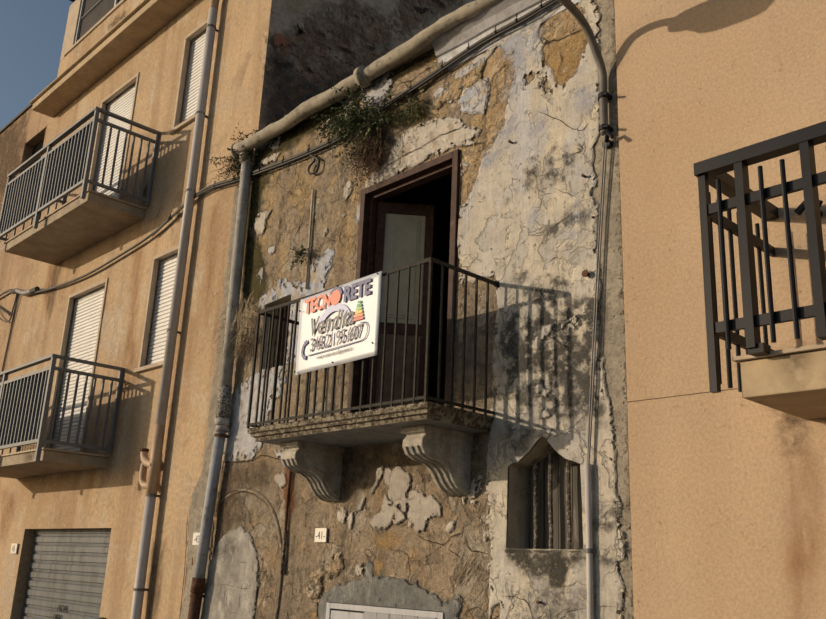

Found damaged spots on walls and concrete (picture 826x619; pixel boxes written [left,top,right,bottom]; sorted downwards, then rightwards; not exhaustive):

damp [264,53,350,124]
flaking render [322,5,588,205]
flaking render [258,136,281,166]
flaking render [253,209,272,236]
damp [490,275,604,417]
flaking render [532,315,580,351]
flaking render [533,381,551,397]
flaking render [337,464,442,533]
flaking render [489,600,503,619]
crack [507,581,612,619]